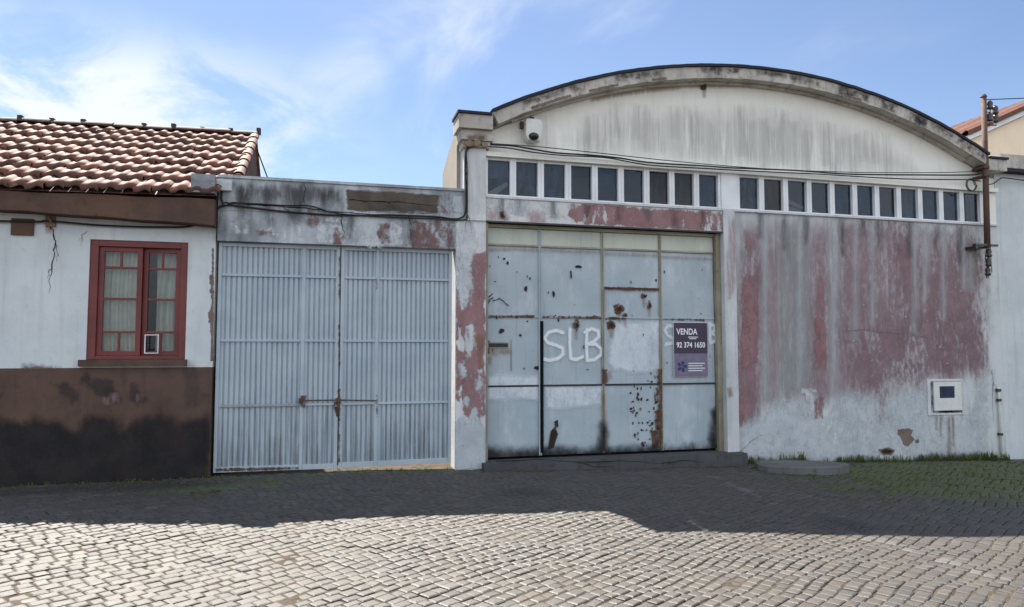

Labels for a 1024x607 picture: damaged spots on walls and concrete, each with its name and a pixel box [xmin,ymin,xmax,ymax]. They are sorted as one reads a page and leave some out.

crack [47,227,87,291]
peeling [233,189,509,470]
corrosion [488,303,628,354]
corrosion [606,287,658,309]
peeling [487,199,989,462]
corrosion [488,369,717,457]
leakage [0,417,210,487]